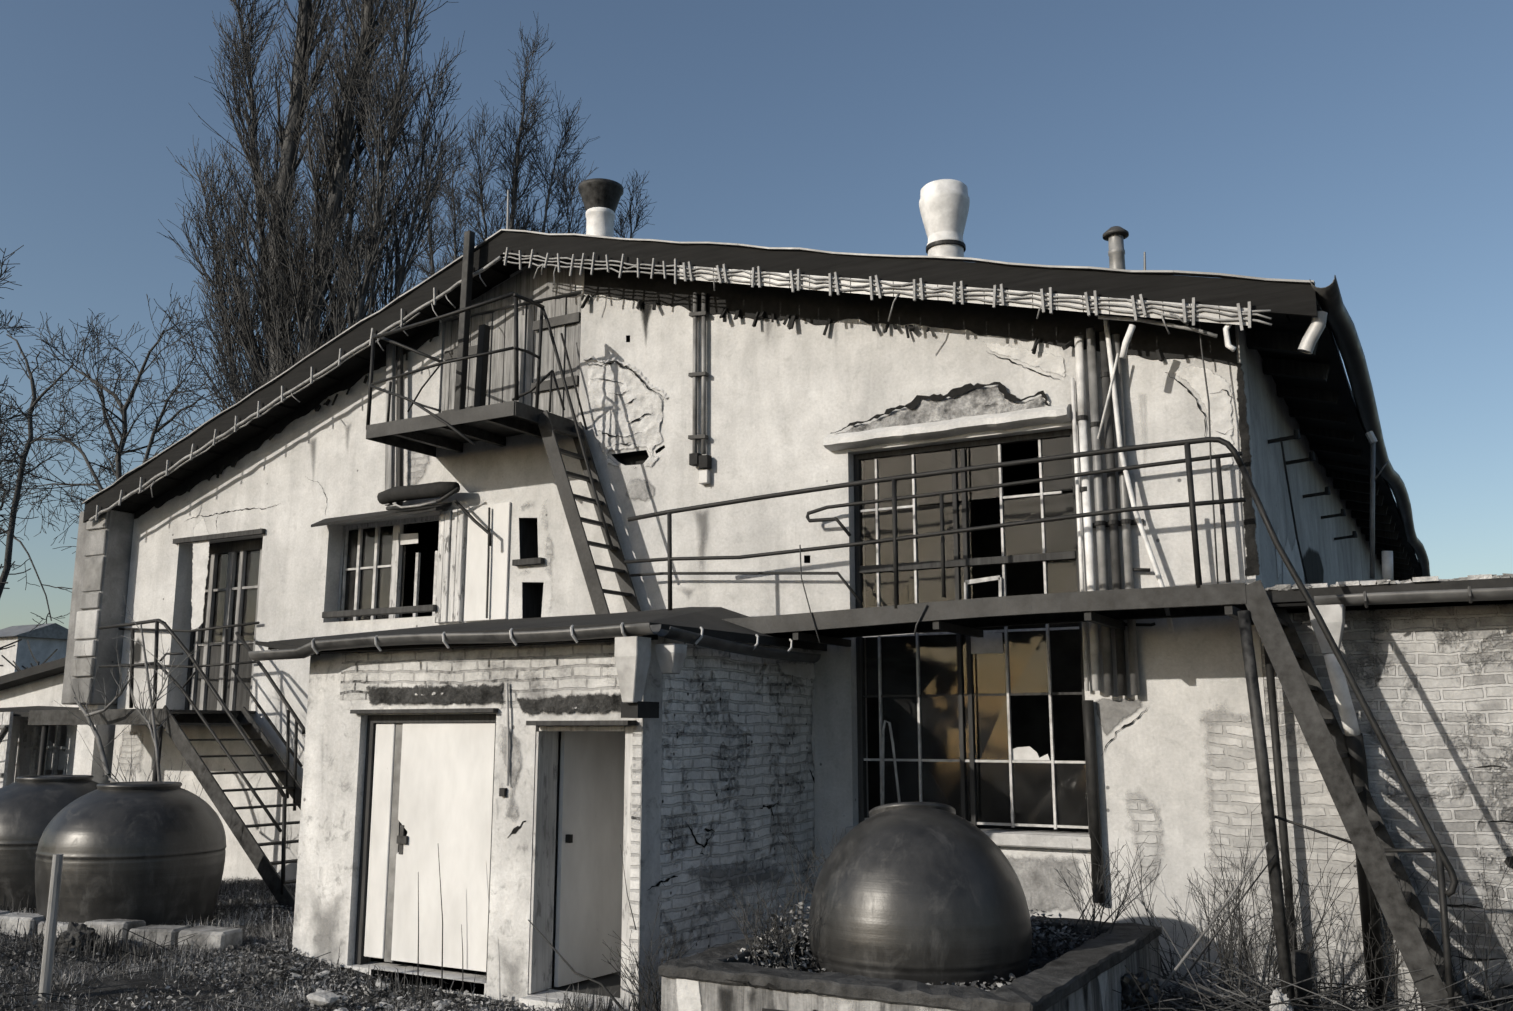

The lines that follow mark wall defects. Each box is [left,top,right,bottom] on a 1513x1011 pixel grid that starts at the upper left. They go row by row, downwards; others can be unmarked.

flaking render [584,355,668,468]
flaking render [830,341,1065,434]
crack [186,505,277,532]
flaking render [1096,698,1147,756]
flaking render [690,865,786,894]